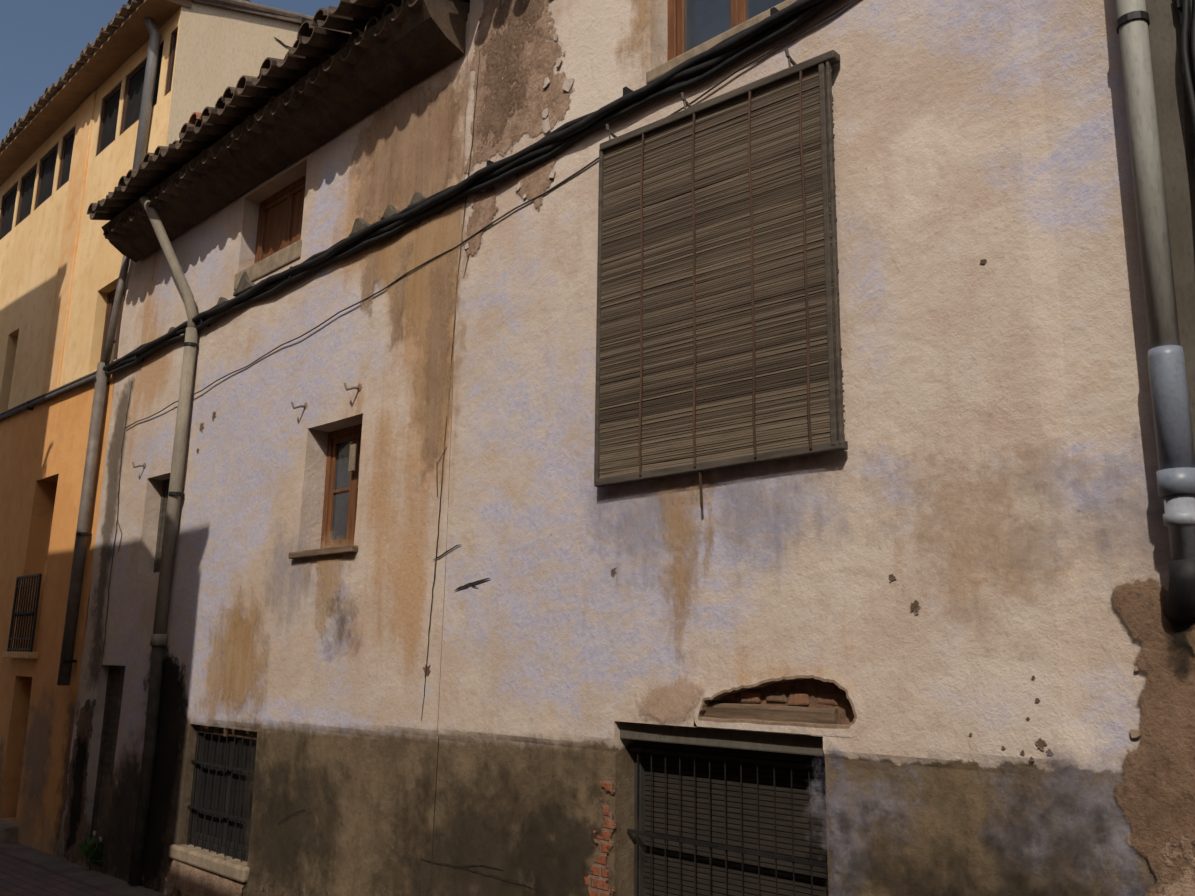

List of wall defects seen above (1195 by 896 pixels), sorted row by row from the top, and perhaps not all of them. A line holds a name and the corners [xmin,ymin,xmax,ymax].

damp [351,63,470,224]
peeling [464,186,498,257]
peeling [464,0,575,174]
peeling [515,157,556,210]
damp [360,198,463,473]
damp [102,648,188,889]
damp [246,763,336,896]
damp [394,781,600,896]
spalling [584,778,616,896]
spalling [639,664,868,738]
damp [834,797,1106,896]
peeling [1112,577,1195,896]